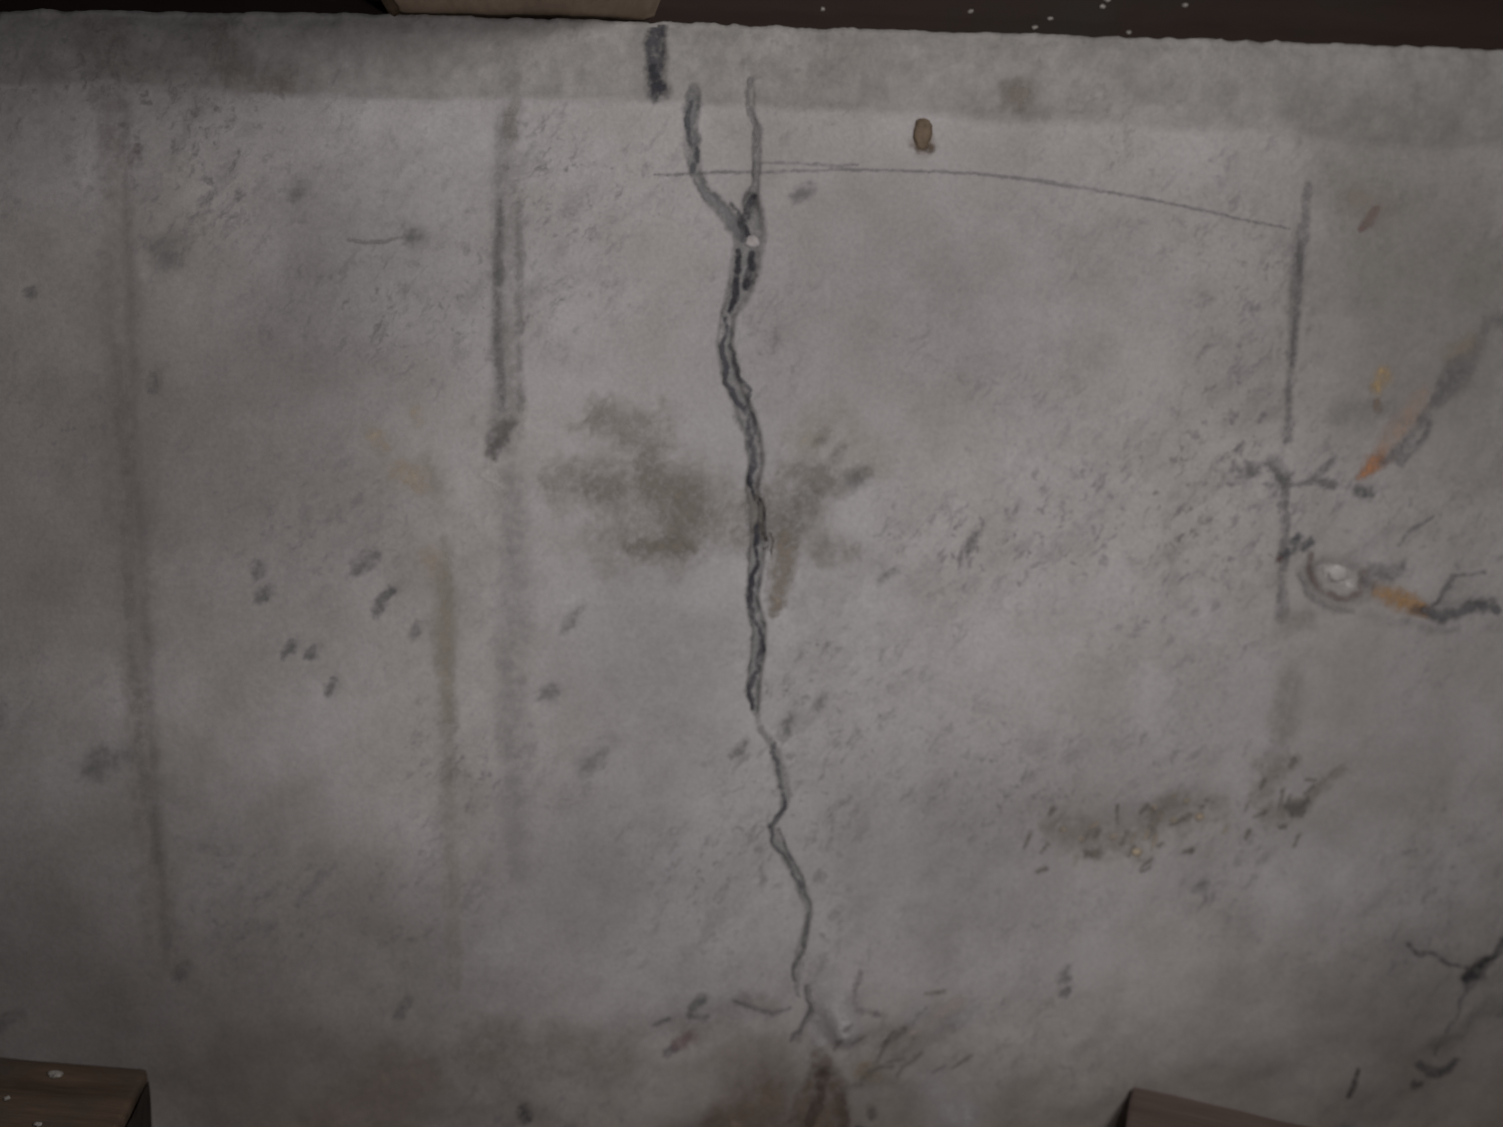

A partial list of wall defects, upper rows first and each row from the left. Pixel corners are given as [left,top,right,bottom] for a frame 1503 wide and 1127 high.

leakage [569,461,801,617]
crack [654,77,1285,1041]
crack [1239,459,1335,488]
crack [1421,571,1501,622]
crack [1407,939,1503,1087]